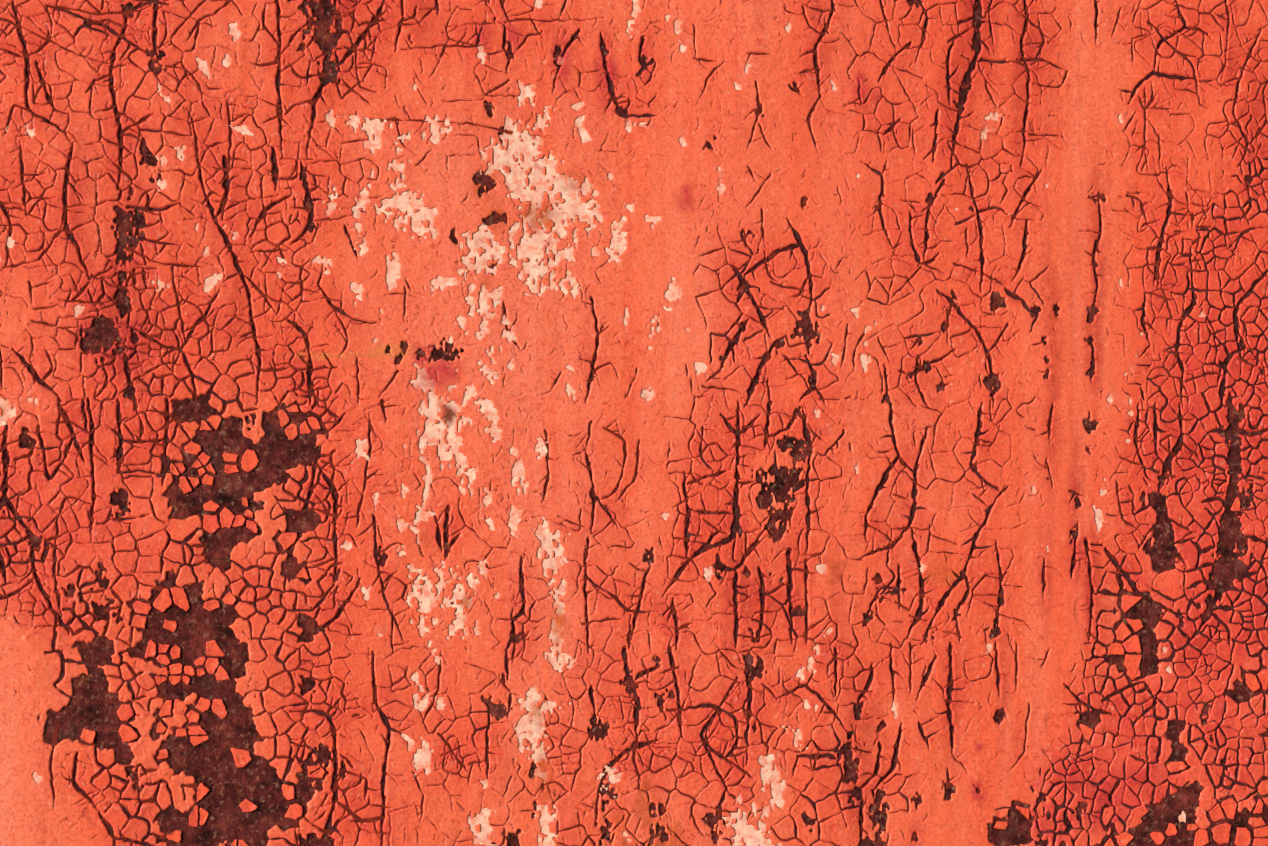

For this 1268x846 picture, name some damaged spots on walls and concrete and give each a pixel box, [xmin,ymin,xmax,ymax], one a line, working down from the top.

peeling [322,109,452,256]
corrosion [158,390,331,585]
crack [0,0,776,846]
peeling [397,80,661,673]
corrosion [752,436,813,543]
corrosion [1197,400,1268,625]
corrosion [44,562,346,846]
peeling [401,733,433,777]
peeling [514,685,574,783]
peeling [722,750,785,846]
corrosion [988,718,1268,846]
corrosion [1105,588,1185,685]